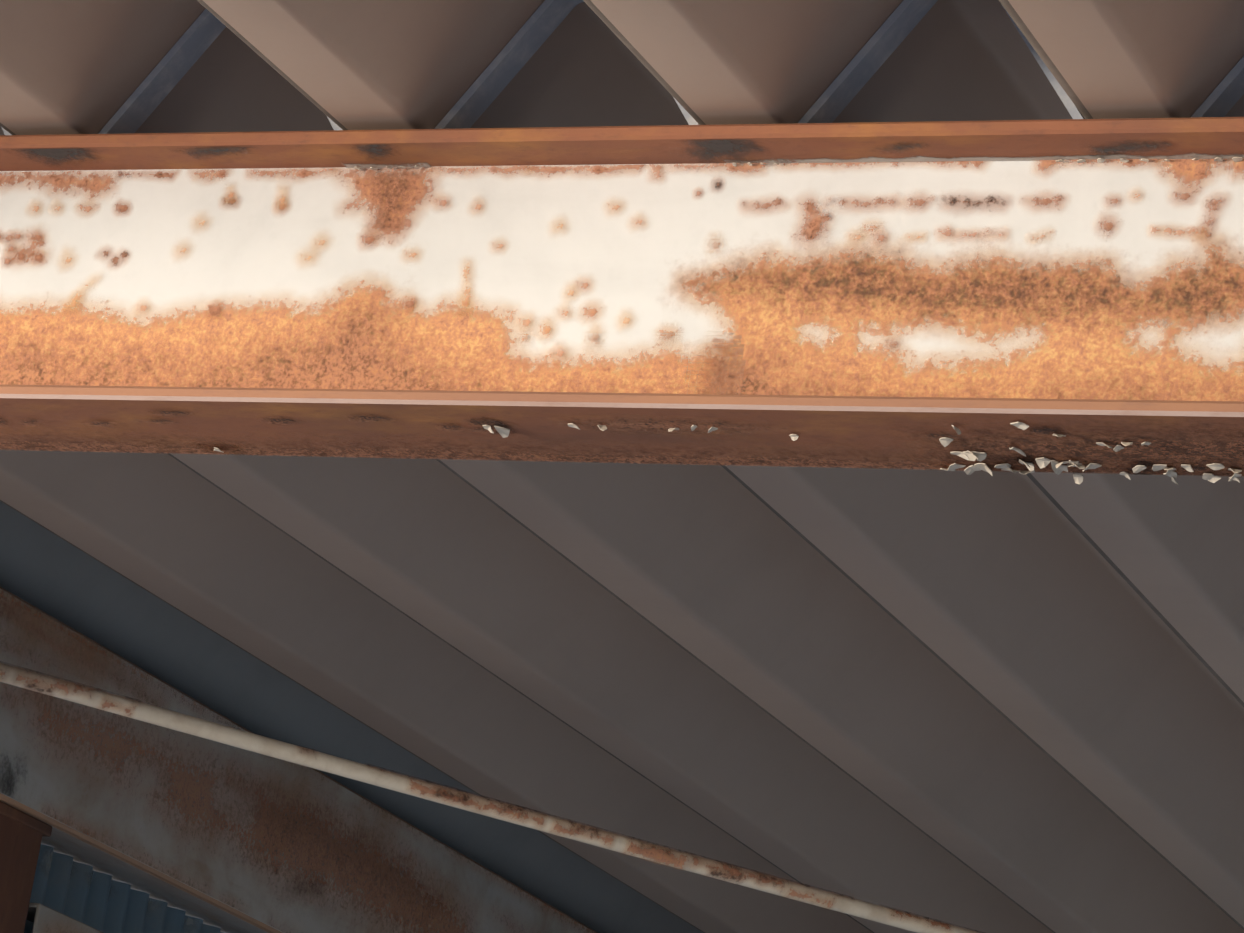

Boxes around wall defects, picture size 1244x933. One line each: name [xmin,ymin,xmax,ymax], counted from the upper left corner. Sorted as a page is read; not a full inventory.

corrosion [0,158,1244,401]
corrosion [0,429,1244,476]
peeling [924,422,1244,484]
corrosion [411,777,614,845]
corrosion [627,836,853,907]